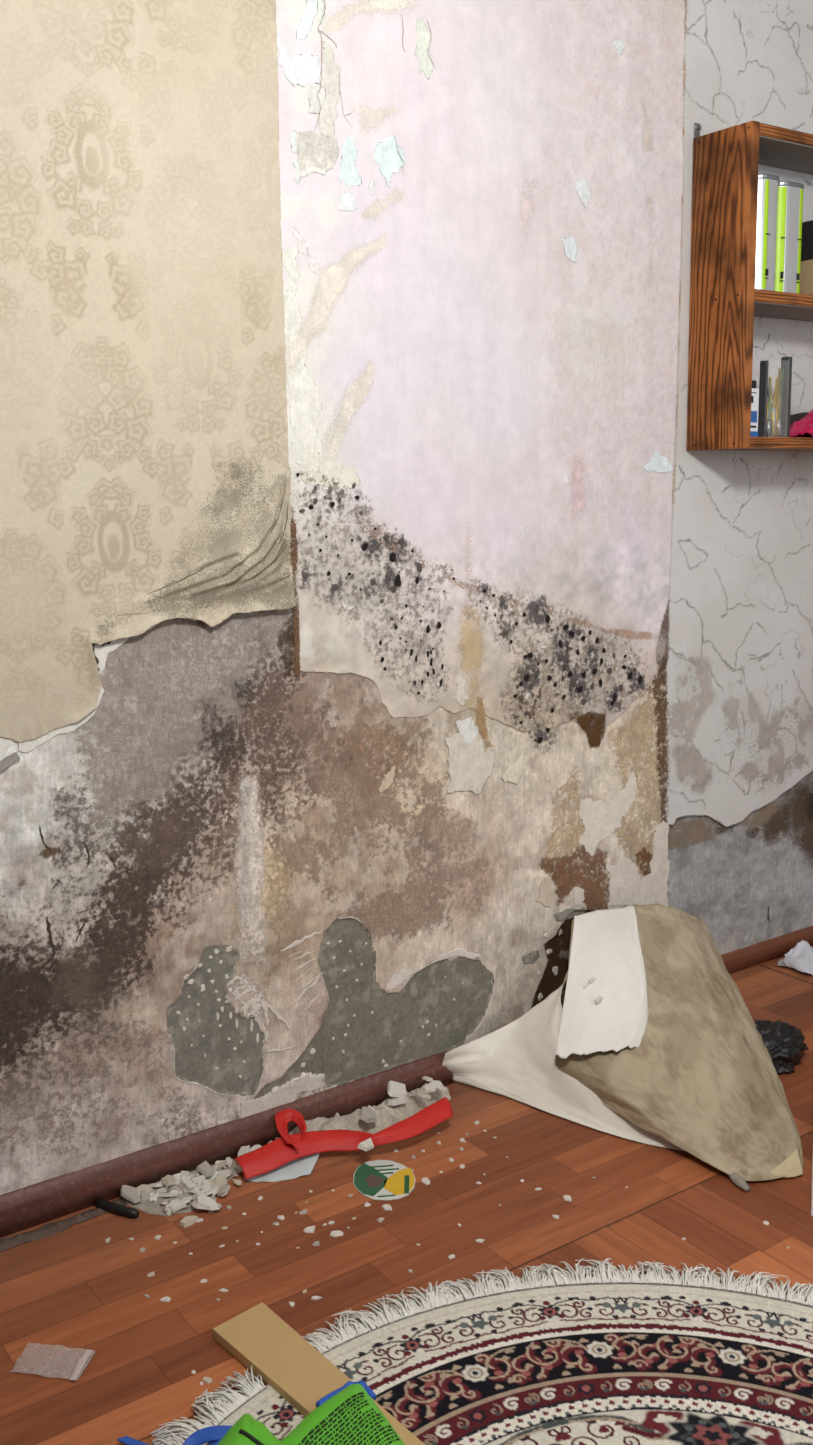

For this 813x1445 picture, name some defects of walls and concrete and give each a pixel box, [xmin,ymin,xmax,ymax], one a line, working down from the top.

peeling [277,0,406,211]
peeling [282,226,360,489]
damp [671,167,684,547]
peeling [0,752,20,773]
peeling [379,765,396,793]
damp [0,456,813,1158]
peeling [445,675,526,795]
peeling [522,771,671,1008]
spalling [166,917,495,1119]